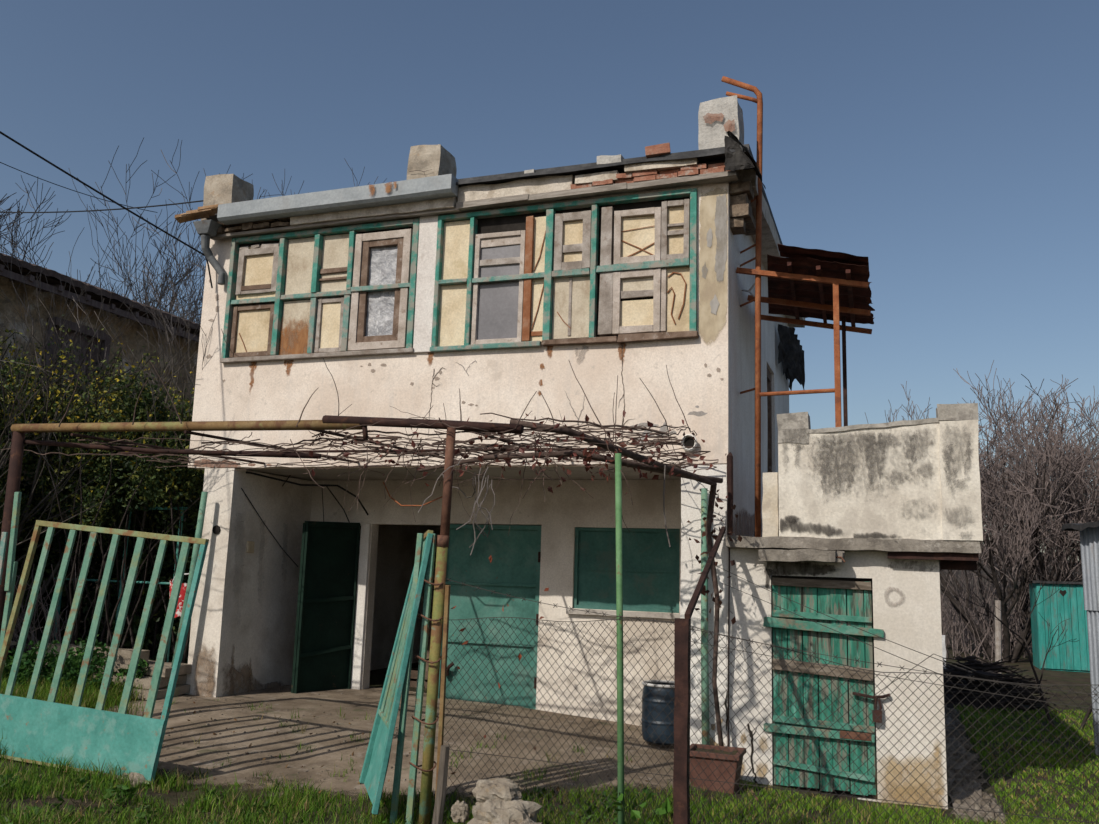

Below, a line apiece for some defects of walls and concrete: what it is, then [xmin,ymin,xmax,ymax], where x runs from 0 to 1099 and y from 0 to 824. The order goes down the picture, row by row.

flaking render [570,163,730,189]
flaking render [698,188,728,343]
water stain [784,429,971,493]
water stain [780,515,895,538]
water stain [195,646,281,697]
water stain [885,747,942,808]